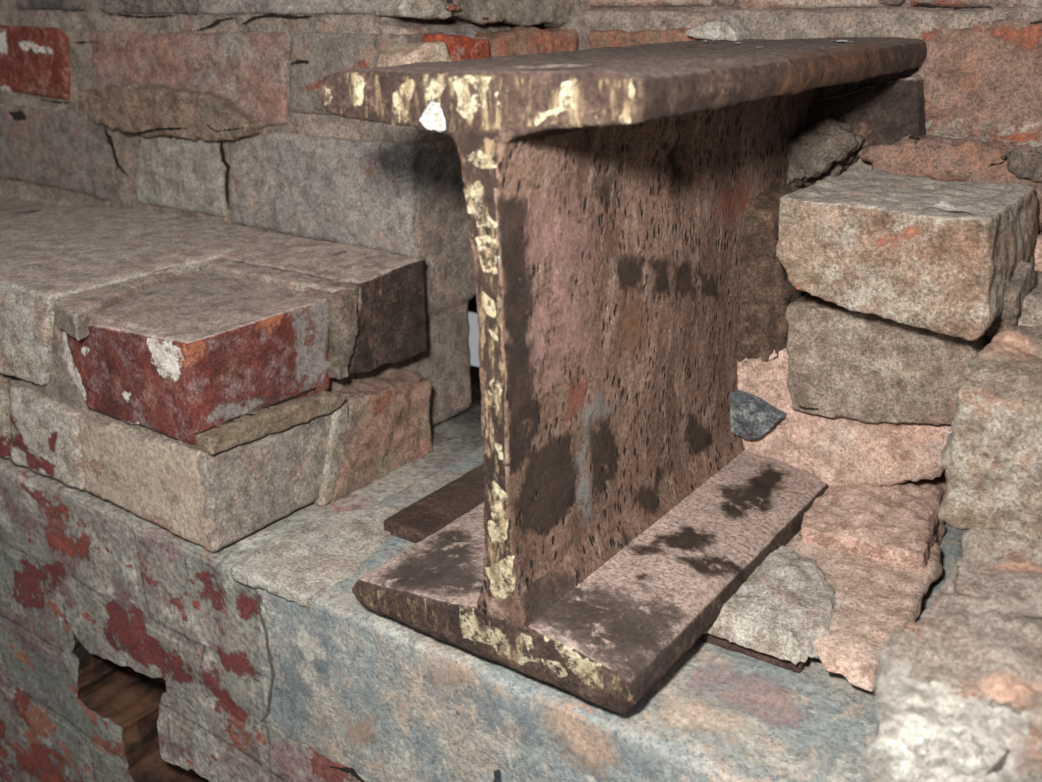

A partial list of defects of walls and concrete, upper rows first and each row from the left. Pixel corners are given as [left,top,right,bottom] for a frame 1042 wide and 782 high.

peeling [596,78,642,124]
crack [104,121,244,209]
crack [0,373,34,384]
peeling [255,300,342,391]
peeling [306,33,589,599]
rust [380,132,619,595]
rust [617,256,718,298]
rust [720,464,784,518]
rust [624,526,744,581]
peeling [103,600,259,722]
peeling [360,590,633,701]
rust [523,574,686,696]